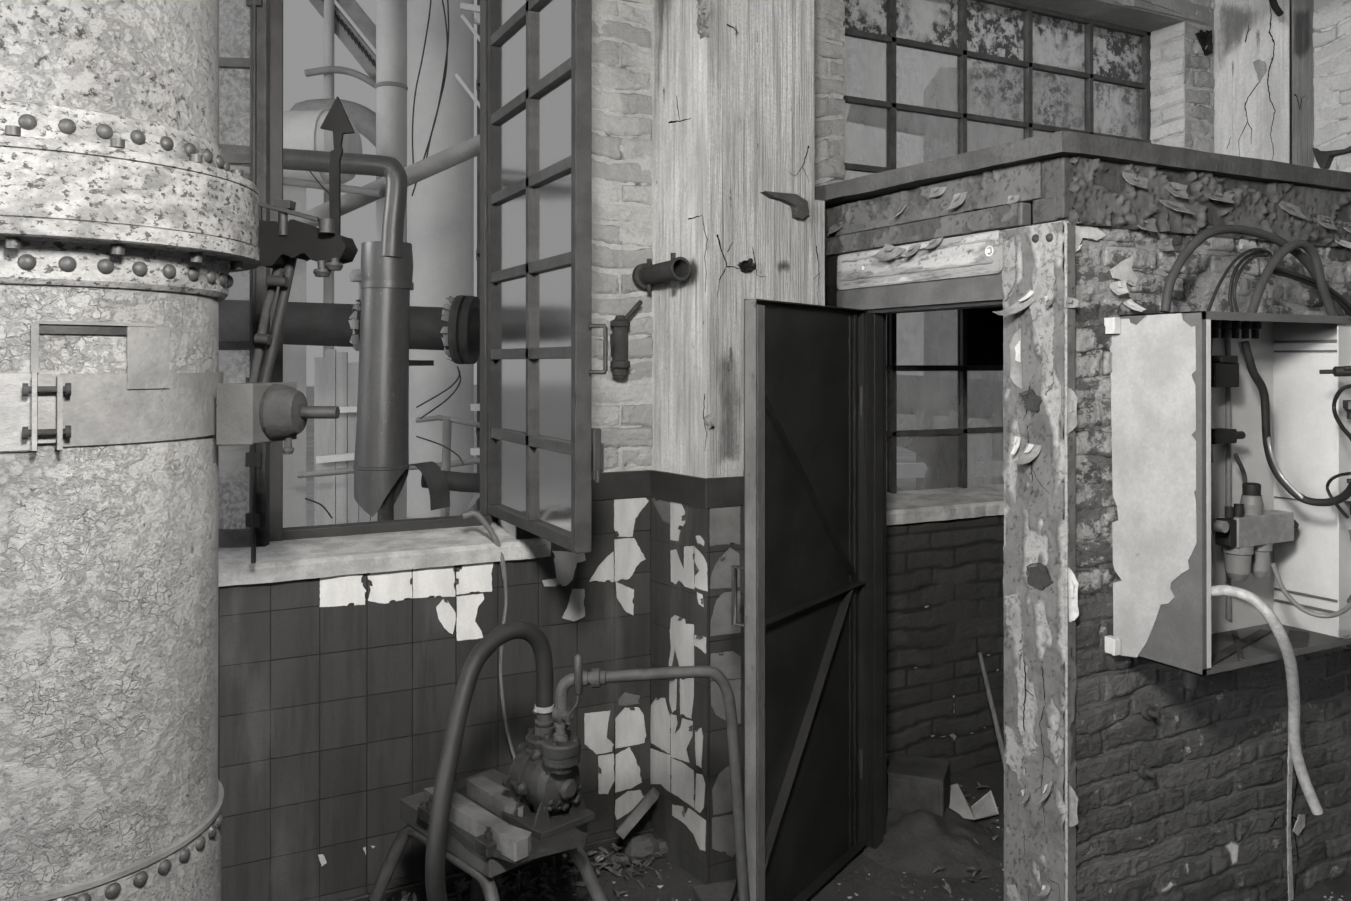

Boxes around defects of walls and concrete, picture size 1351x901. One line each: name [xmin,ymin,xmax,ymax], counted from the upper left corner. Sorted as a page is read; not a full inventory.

crack [1227,7,1303,159]
peeling [1075,225,1106,254]
peeling [1159,182,1234,214]
peeling [1238,239,1257,255]
peeling [1278,201,1351,248]
peeling [1110,256,1146,312]
peeling [1011,436,1042,464]
peeling [320,562,494,641]
peeling [1004,562,1079,670]
peeling [542,498,741,857]
peeling [1005,726,1059,804]
peeling [1069,785,1078,827]